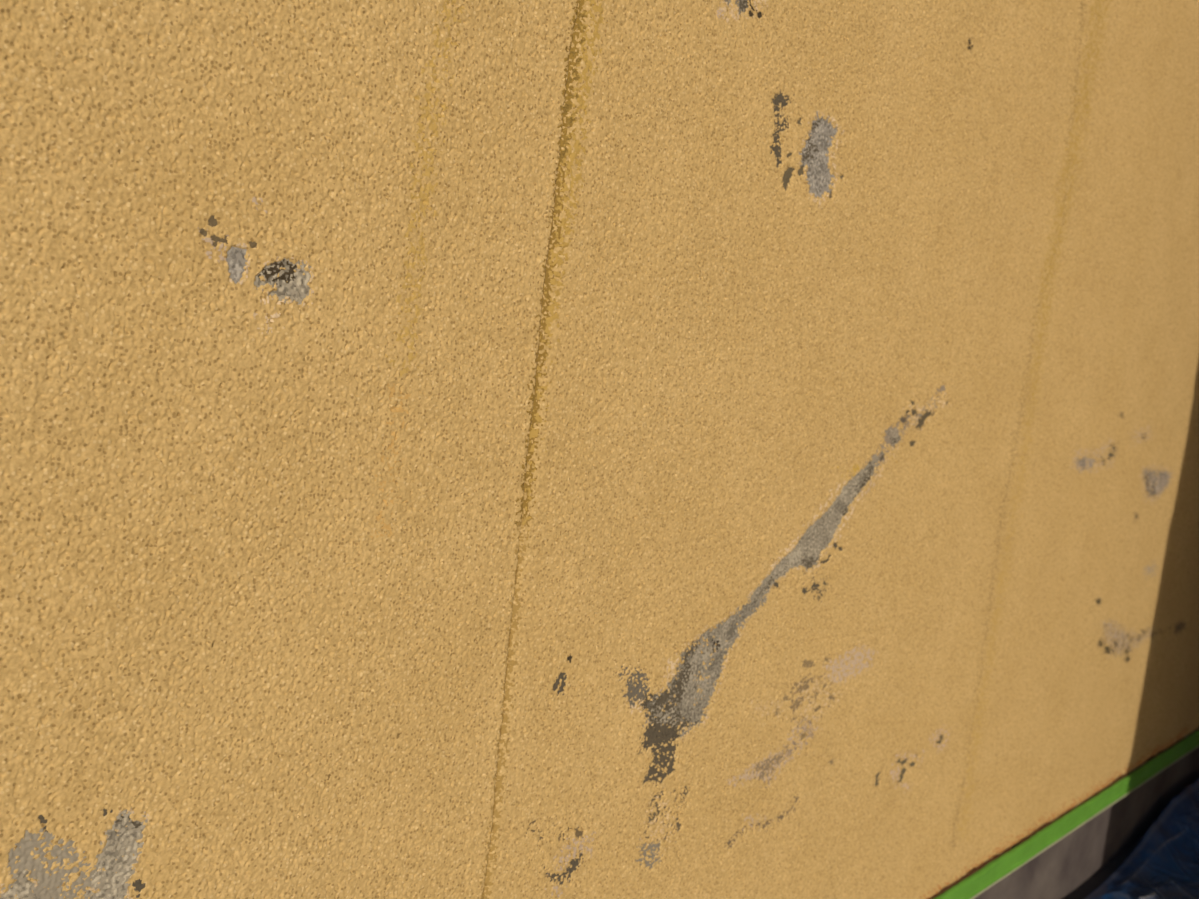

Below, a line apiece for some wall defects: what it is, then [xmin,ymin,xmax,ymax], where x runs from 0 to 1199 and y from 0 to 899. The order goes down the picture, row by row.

peeling [724,0,764,19]
peeling [770,89,844,200]
peeling [199,215,314,307]
crack [483,1,578,899]
peeling [900,401,948,447]
peeling [801,543,843,602]
peeling [615,666,653,711]
peeling [729,654,835,788]
peeling [0,807,149,899]